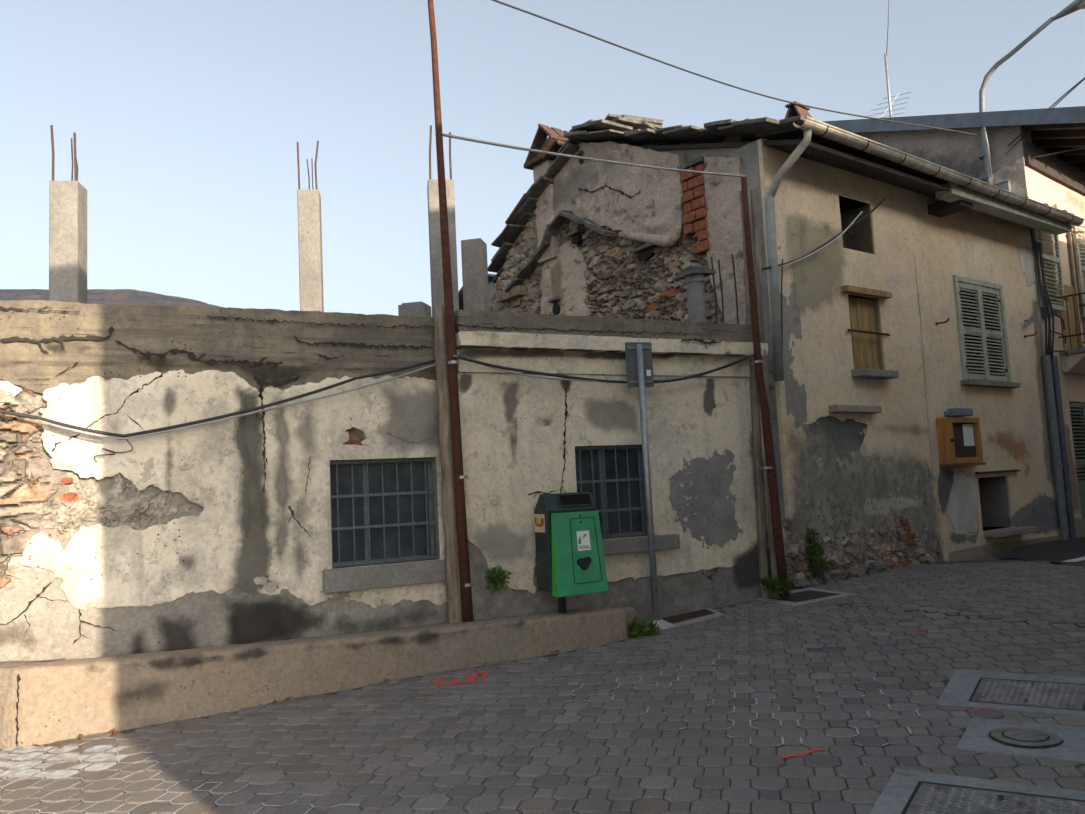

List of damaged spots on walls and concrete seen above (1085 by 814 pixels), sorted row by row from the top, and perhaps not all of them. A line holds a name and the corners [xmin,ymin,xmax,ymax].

crack [578,176,640,204]
spalling [489,156,723,324]
damp [165,389,175,412]
crack [0,305,722,498]
spalling [0,374,203,590]
damp [229,391,321,658]
crack [288,459,311,535]
peeling [782,416,978,588]
crack [0,581,119,644]
damp [132,620,217,668]
damp [416,631,438,642]
peeling [460,543,772,623]